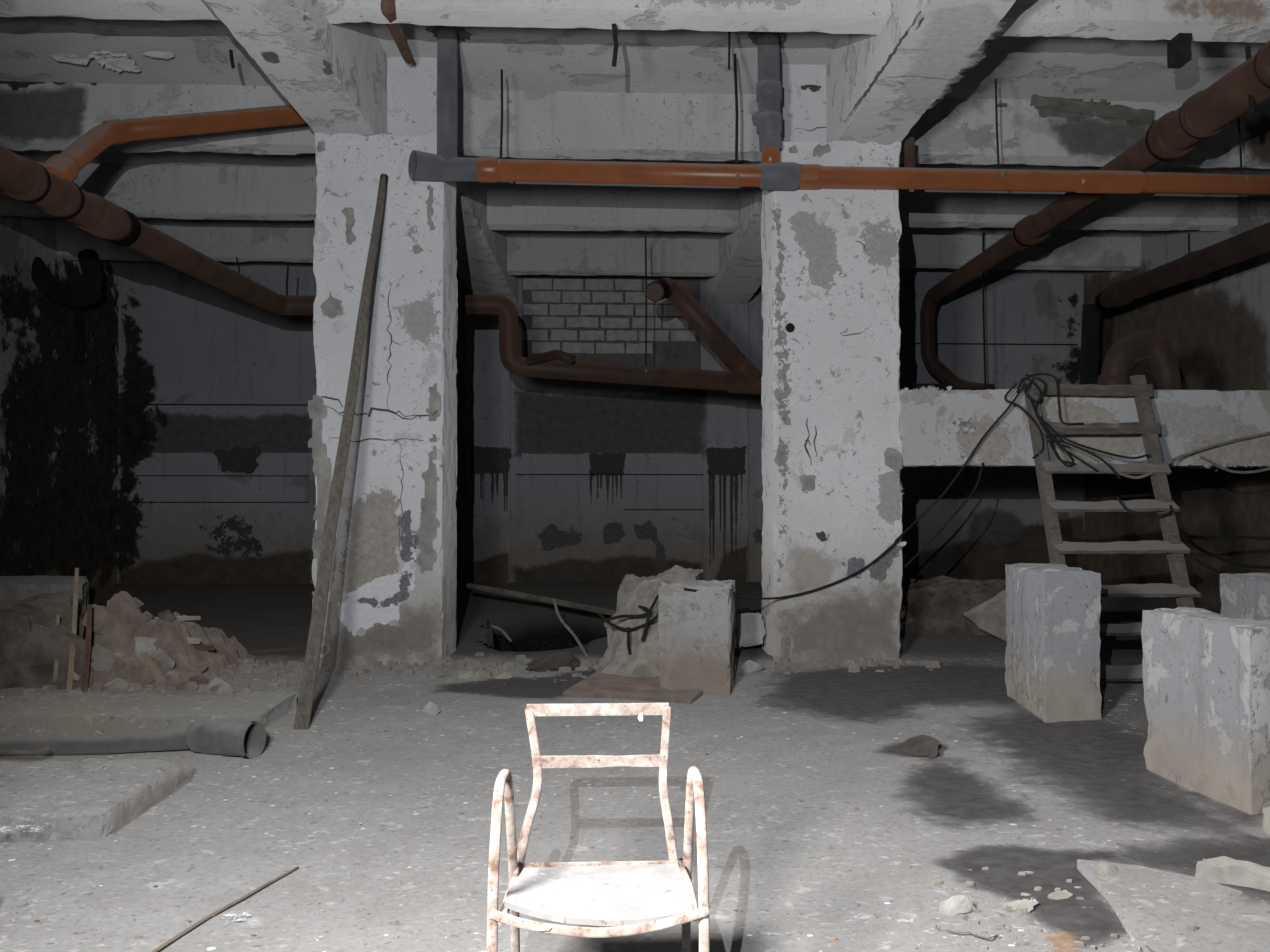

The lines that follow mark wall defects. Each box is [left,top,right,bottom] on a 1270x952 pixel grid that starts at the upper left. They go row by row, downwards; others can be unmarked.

spalling [0,81,66,91]
peeling [48,50,174,73]
crack [795,11,940,131]
leakage [1053,118,1149,156]
peeling [859,216,900,275]
leakage [0,258,312,588]
crack [321,281,437,552]
leakage [515,389,705,456]
peeling [308,383,441,658]
leakage [470,469,747,584]